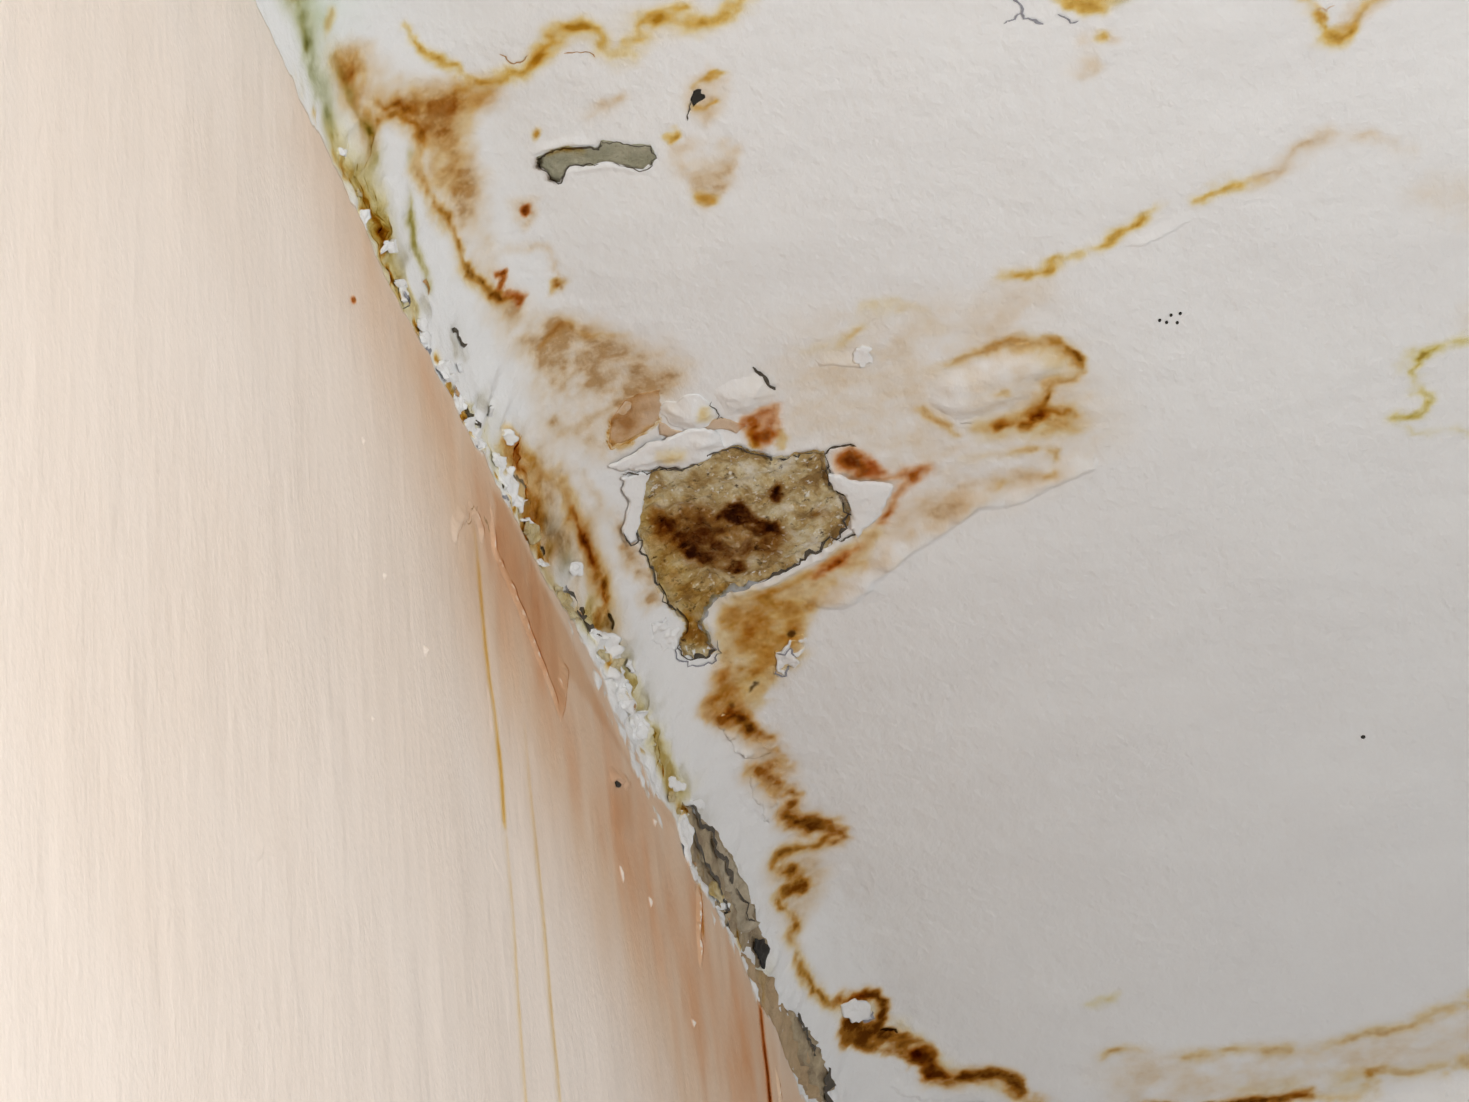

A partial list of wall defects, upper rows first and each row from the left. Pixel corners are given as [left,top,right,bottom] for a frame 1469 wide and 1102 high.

spalling [528,136,659,185]
spalling [606,389,1098,667]
peeling [774,634,807,677]
damp [716,696,772,738]
peeling [717,713,779,823]
damp [754,767,845,910]
damp [799,963,1027,1097]
peeling [889,1078,969,1102]
damp [1230,1093,1307,1102]